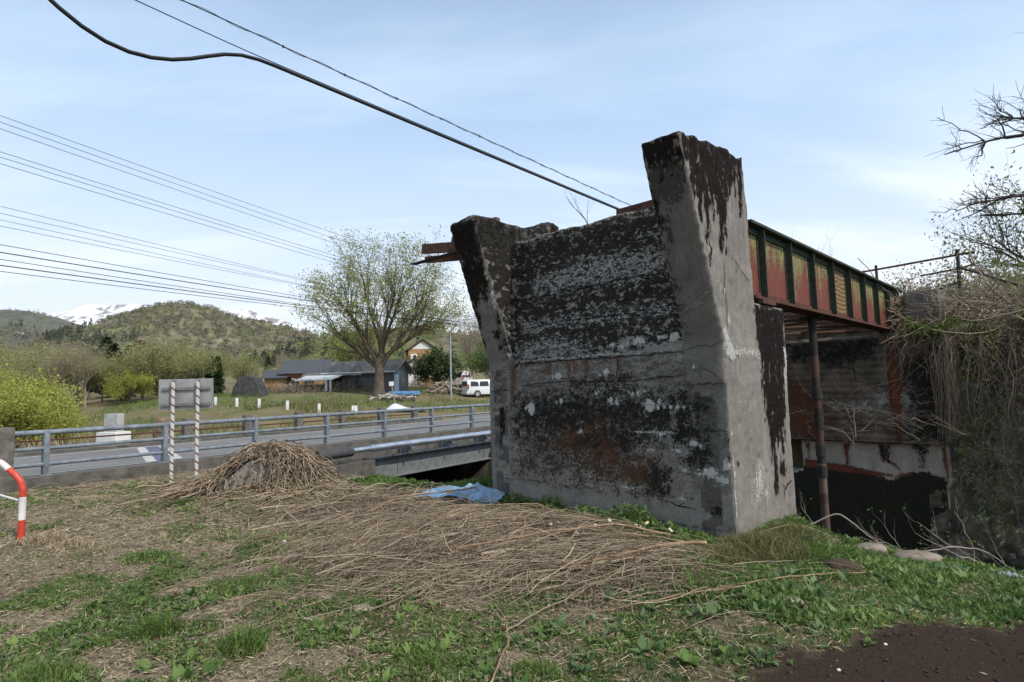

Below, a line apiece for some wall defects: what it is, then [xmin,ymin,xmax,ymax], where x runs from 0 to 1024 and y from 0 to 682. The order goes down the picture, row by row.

damp [450,133,743,367]
damp [498,372,731,501]
damp [727,304,949,553]